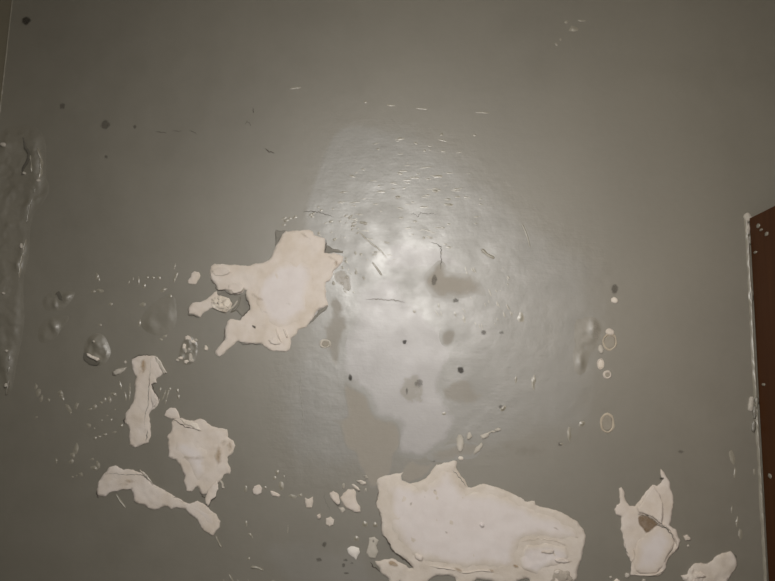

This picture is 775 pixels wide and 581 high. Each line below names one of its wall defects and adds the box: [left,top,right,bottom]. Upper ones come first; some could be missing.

peeling [176,230,349,365]
leakage [267,119,616,491]
peeling [112,354,167,448]
peeling [96,408,235,536]
peeling [305,428,586,581]
peeling [609,470,691,581]
peeling [681,551,737,581]